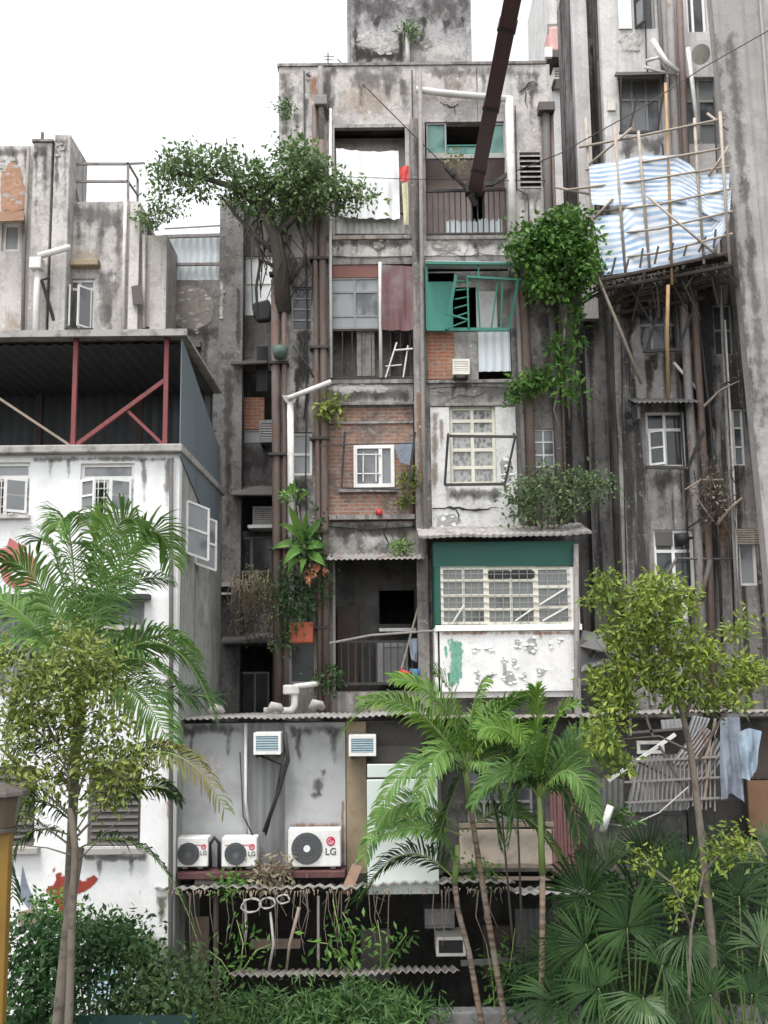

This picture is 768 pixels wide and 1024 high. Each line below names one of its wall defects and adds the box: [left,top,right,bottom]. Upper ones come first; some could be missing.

damp [281,74,308,134]
damp [324,68,336,120]
spalling [0,156,25,211]
damp [714,38,768,415]
spalling [176,283,226,334]
damp [645,353,658,386]
damp [678,288,720,458]
damp [34,457,173,491]
damp [654,472,683,501]
peeling [437,514,461,527]
crack [432,506,499,519]
peeling [444,636,564,687]